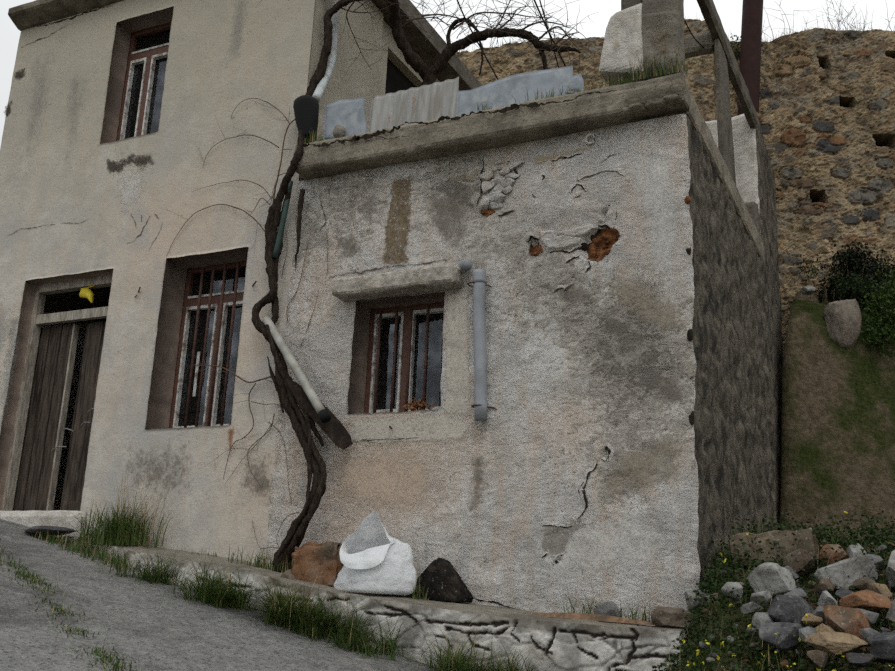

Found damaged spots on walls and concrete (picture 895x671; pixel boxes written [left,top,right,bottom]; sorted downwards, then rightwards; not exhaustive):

crack [302,78,675,147]
spalling [477,157,525,217]
crack [128,214,163,247]
water stain [383,176,412,264]
spalling [525,202,622,262]
crack [542,462,598,528]
crack [540,552,563,565]